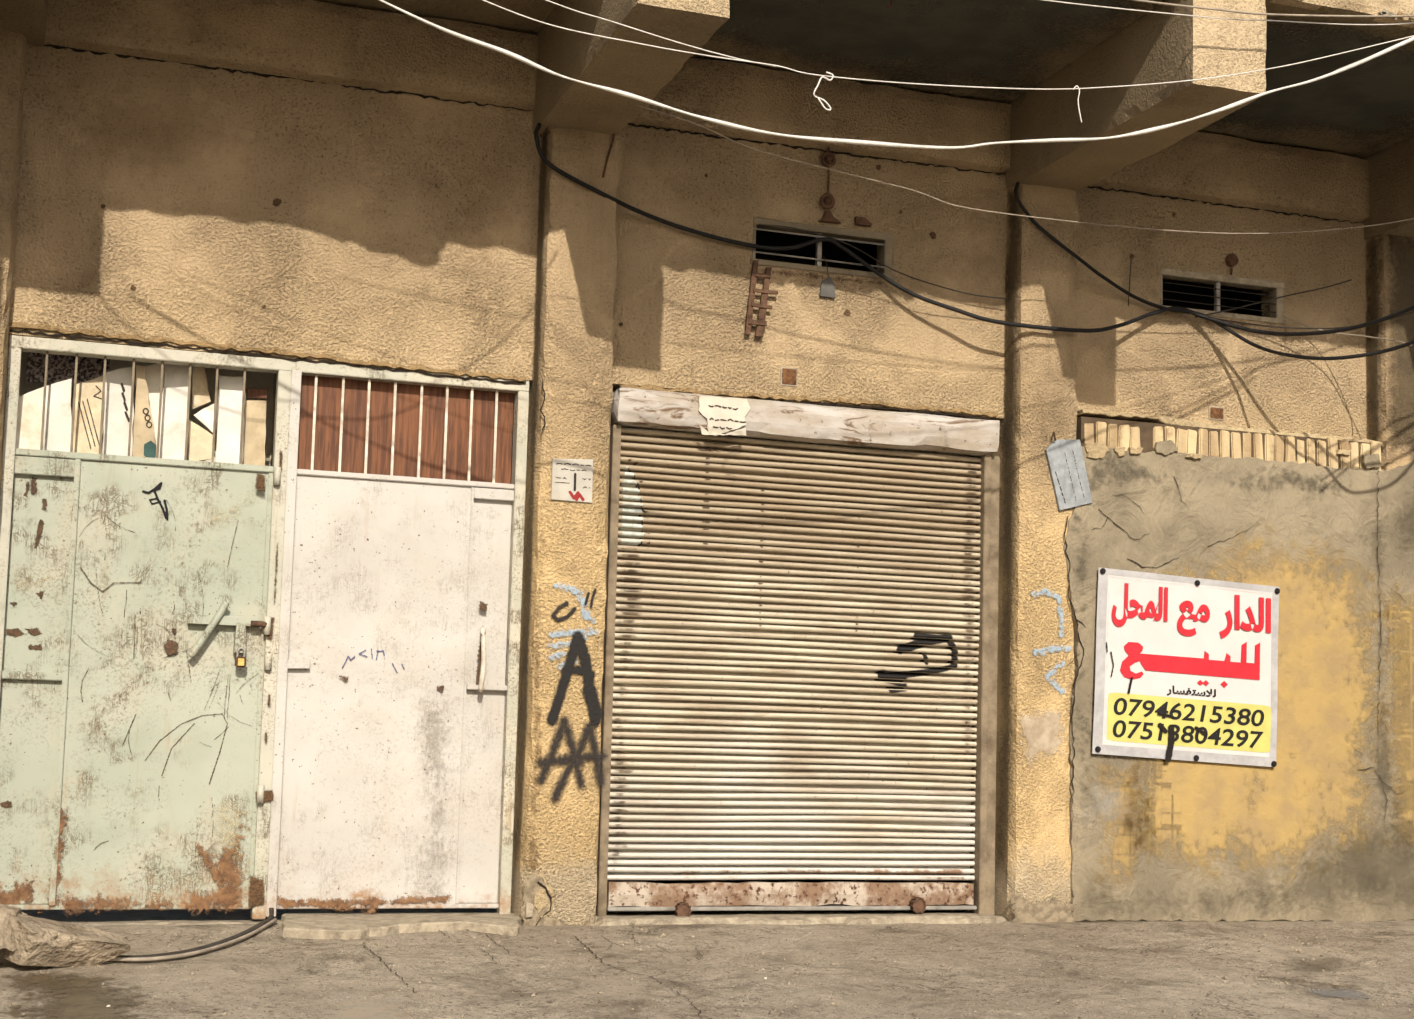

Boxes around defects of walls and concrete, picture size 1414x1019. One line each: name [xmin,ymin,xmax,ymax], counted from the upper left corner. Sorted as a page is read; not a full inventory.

rust [255,473,265,491]
rust [267,545,278,639]
rust [0,790,451,915]
rust [748,869,964,879]
leakage [2,971,145,1019]